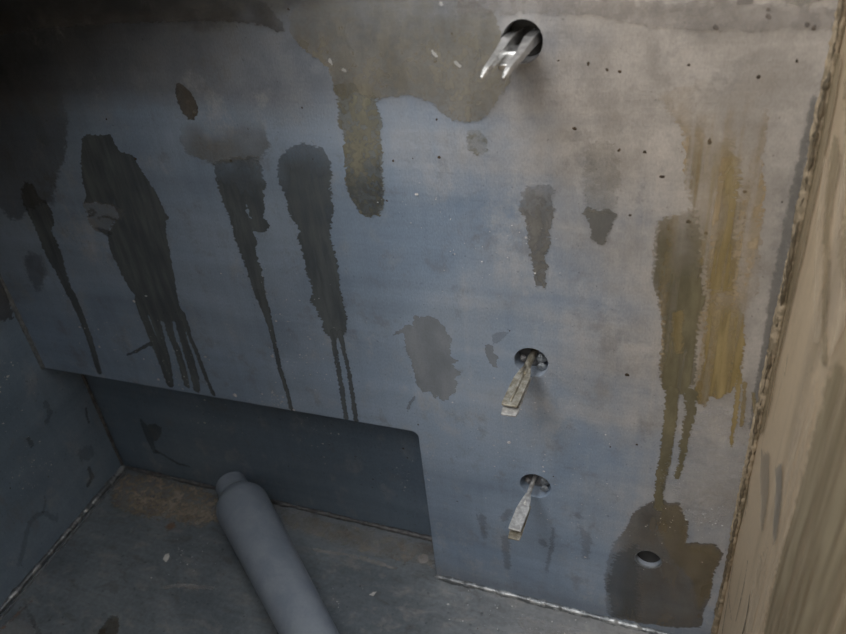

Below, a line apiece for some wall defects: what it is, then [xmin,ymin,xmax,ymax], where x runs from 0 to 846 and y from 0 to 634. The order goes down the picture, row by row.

water stain [21,182,102,374]
water stain [80,134,216,396]
water stain [214,158,293,411]
water stain [277,155,359,422]
water stain [333,85,385,218]
water stain [519,194,555,288]
water stain [582,207,617,245]
rust [653,156,767,511]
water stain [618,500,724,628]